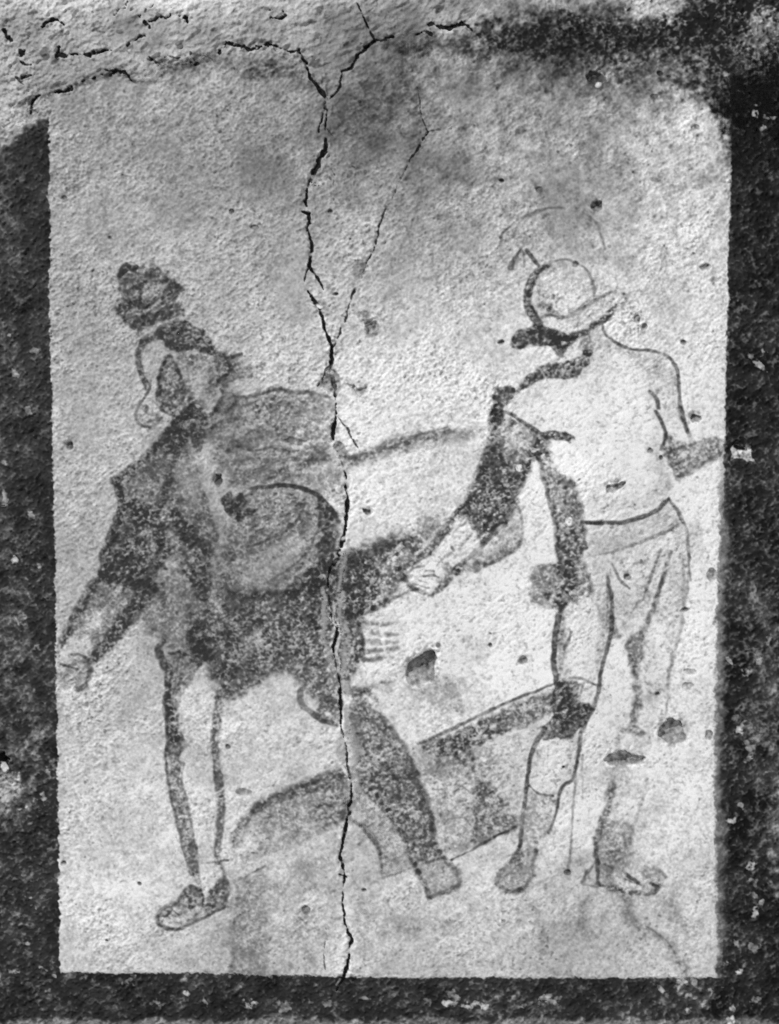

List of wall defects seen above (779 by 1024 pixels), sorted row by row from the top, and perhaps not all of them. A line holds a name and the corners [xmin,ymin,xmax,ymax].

crack [2,1,473,448]
crack [322,471,356,991]
spalling [407,643,440,677]